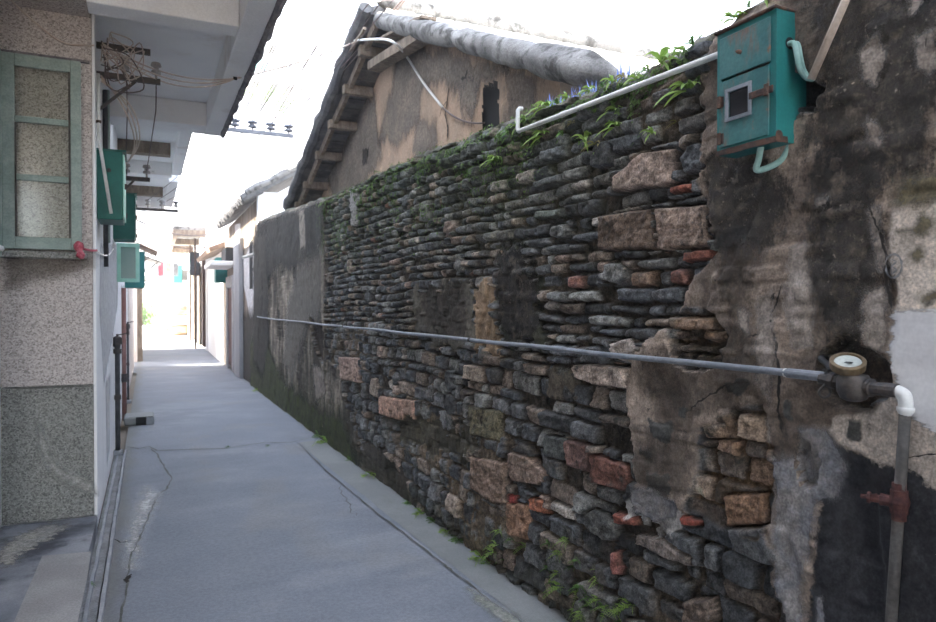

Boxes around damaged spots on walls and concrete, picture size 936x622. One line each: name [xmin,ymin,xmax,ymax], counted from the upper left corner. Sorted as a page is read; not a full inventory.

water stain [698,0,936,365]
flaking render [665,306,729,374]
flaking render [681,240,936,538]
crack [114,446,190,622]
crack [212,437,522,622]
water stain [771,428,895,622]
water stain [898,469,936,622]